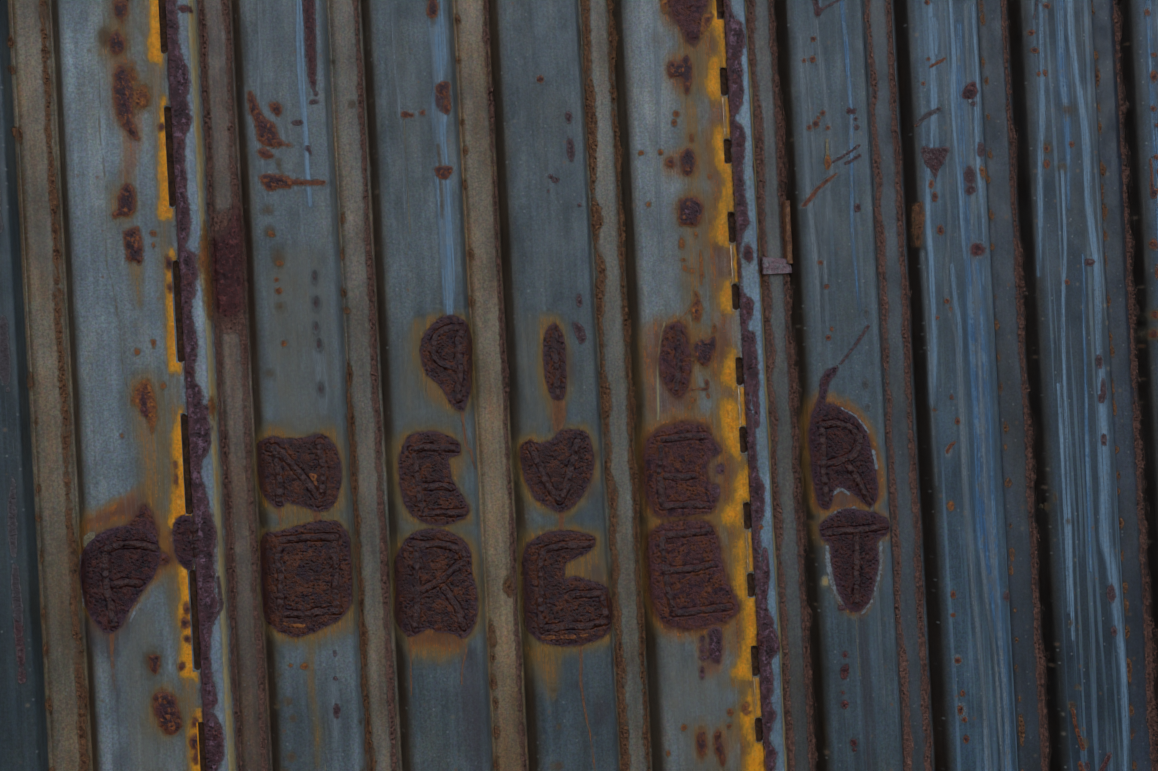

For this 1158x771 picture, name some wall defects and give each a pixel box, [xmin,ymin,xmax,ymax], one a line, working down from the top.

corrosion [39,0,377,771]
corrosion [349,0,499,771]
corrosion [482,0,950,771]